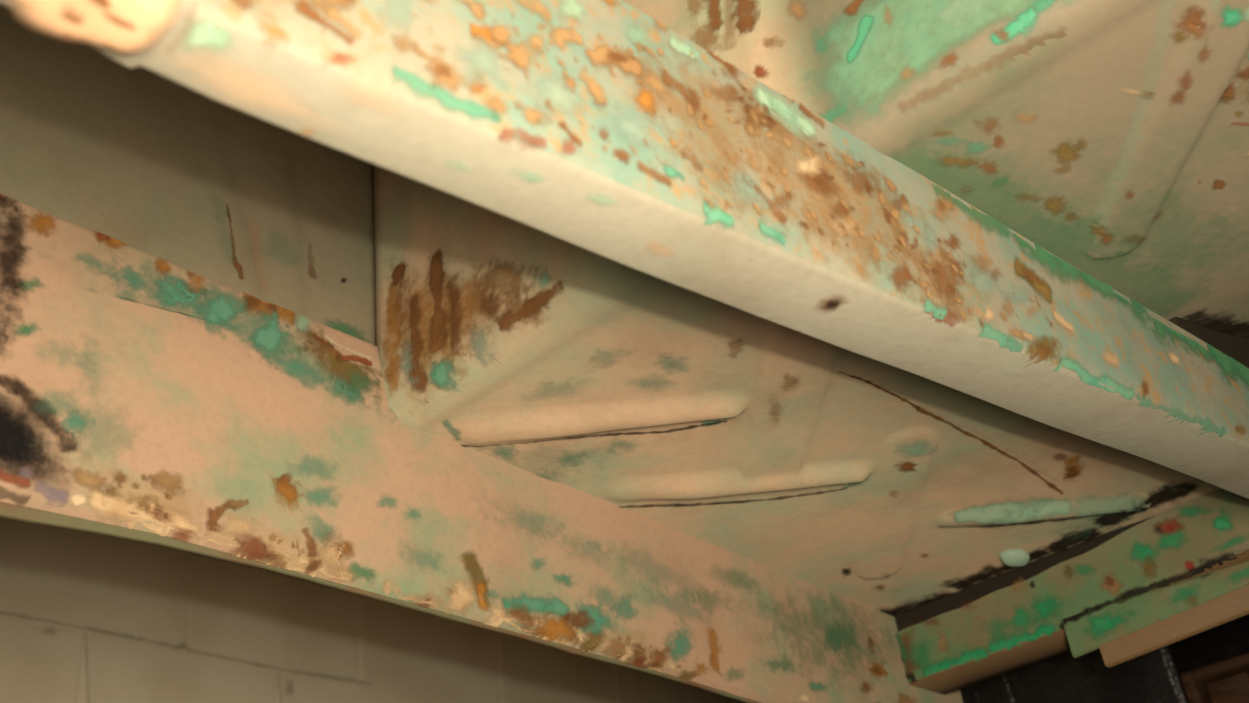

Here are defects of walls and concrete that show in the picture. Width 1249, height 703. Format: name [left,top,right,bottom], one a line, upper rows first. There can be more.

peeling [394,67,500,121]
rust [397,38,550,146]
peeling [756,88,815,136]
peeling [823,0,1053,121]
rust [462,0,1074,364]
rust [227,205,563,391]
crack [838,372,1106,528]
rust [74,469,354,581]
peeling [954,496,1145,525]
rust [383,554,719,680]
peeling [918,599,1058,676]
leakage [1059,553,1237,630]